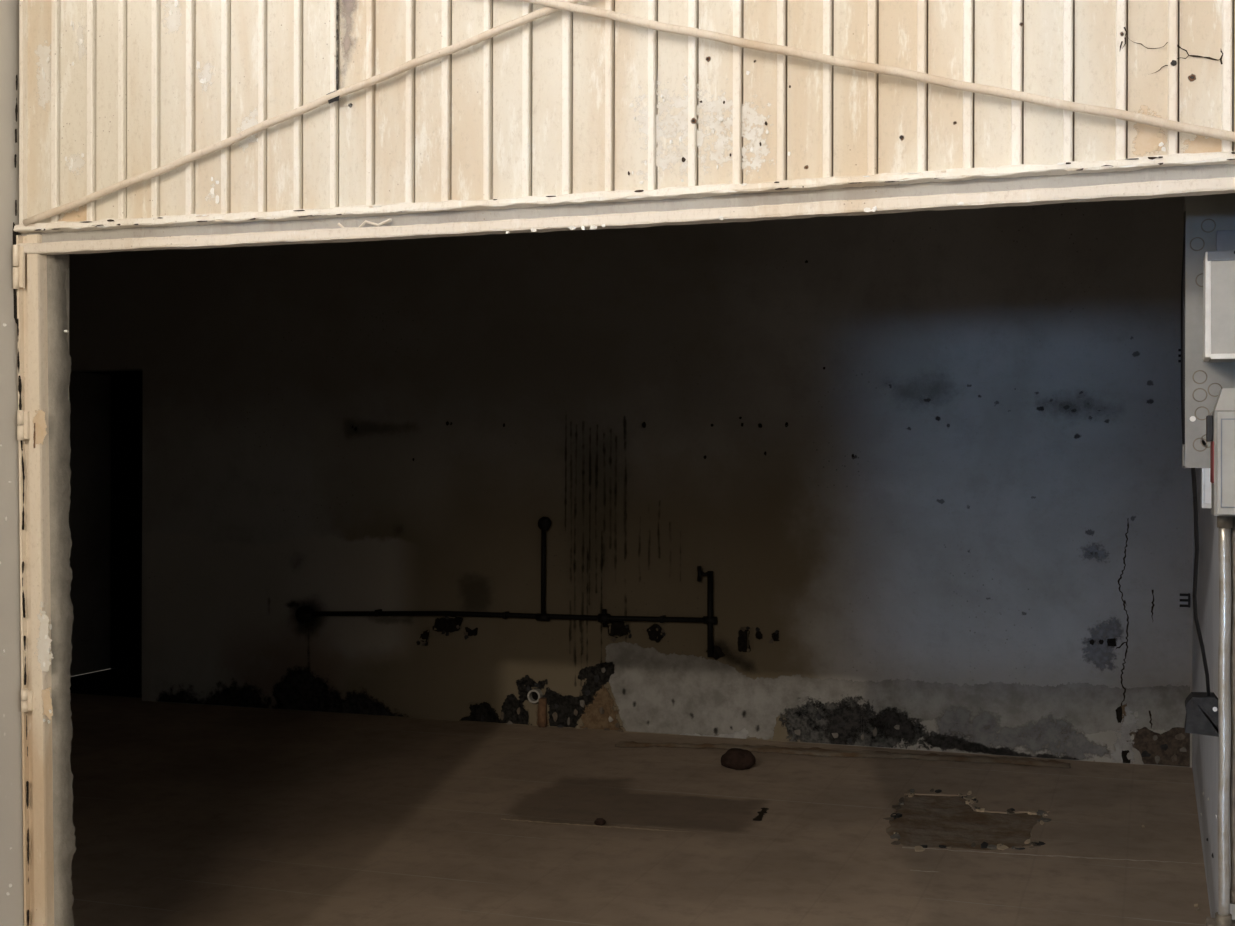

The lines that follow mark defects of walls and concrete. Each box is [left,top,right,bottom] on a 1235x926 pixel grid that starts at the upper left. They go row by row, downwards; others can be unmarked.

crack [1120,27,1223,75]
crack [1115,518,1154,728]
peeling [459,662,636,732]
peeling [680,711,759,739]
flaking render [1116,704,1190,767]
peeling [883,789,1051,852]